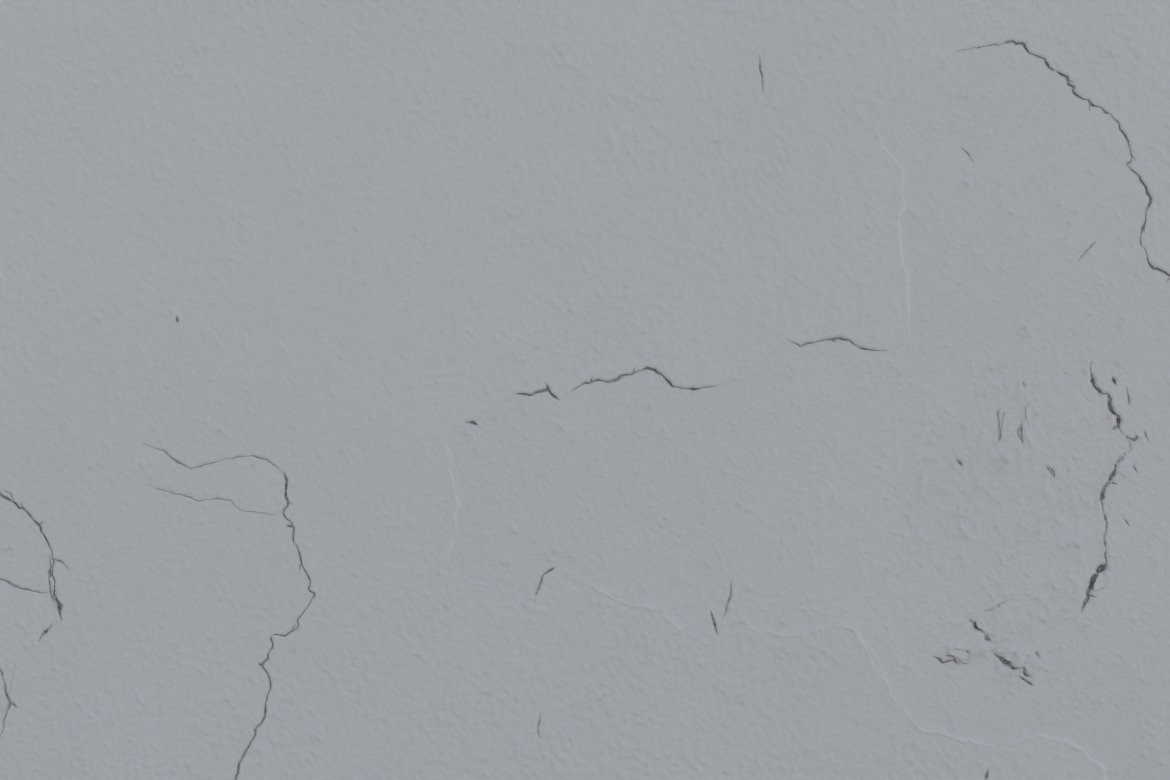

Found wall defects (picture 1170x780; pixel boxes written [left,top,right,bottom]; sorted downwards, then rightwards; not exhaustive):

crack [956,40,1170,281]
crack [514,367,715,400]
crack [788,337,885,351]
crack [1082,366,1150,610]
crack [0,491,71,640]
crack [144,443,316,780]
crack [0,669,17,734]